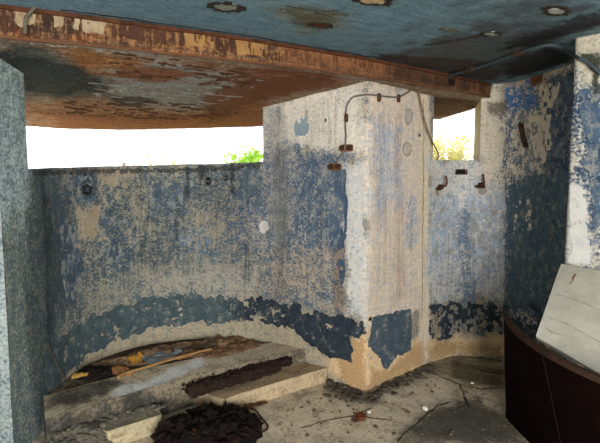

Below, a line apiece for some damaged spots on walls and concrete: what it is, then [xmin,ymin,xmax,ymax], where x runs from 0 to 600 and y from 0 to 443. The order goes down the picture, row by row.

spalling [206,1,246,13]
spalling [540,5,572,16]
rust [111,24,185,46]
leakage [0,50,243,107]
rust [379,54,500,80]
leakage [504,48,575,79]
peeling [428,73,600,344]
peeling [43,151,412,392]
crack [397,356,503,442]